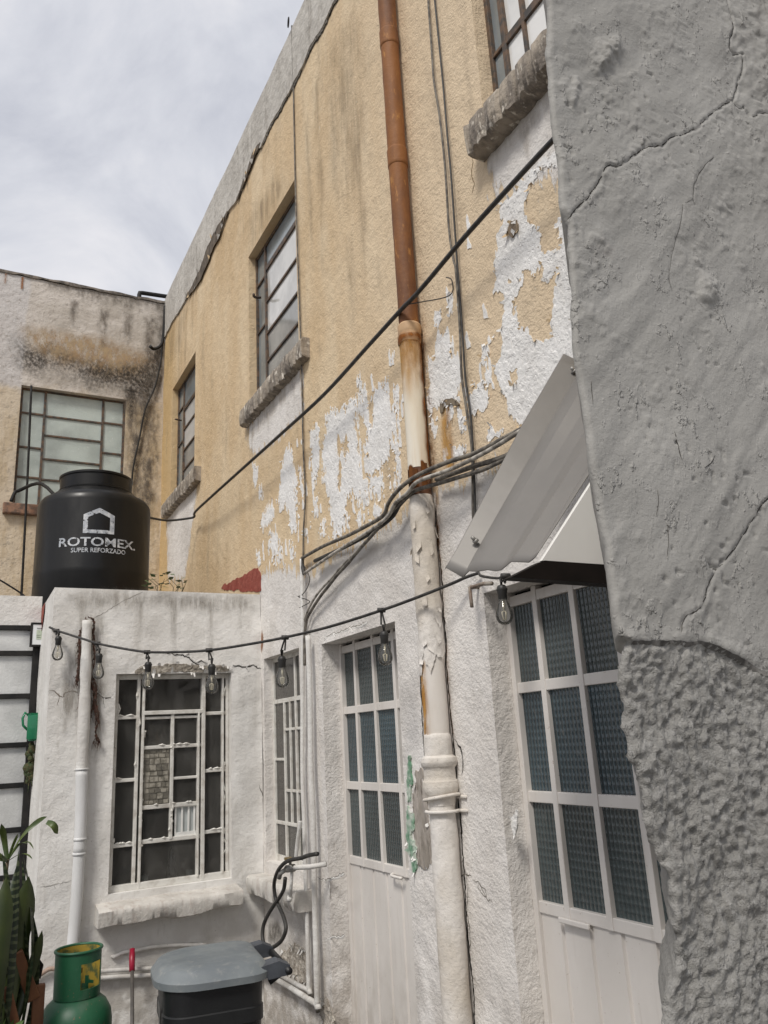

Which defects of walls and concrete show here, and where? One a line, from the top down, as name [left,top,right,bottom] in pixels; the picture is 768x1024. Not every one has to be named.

crack [568,4,768,219]
water stain [23,310,163,500]
peeling [252,349,446,675]
peeling [425,151,573,461]
crack [681,498,768,632]
flaking render [404,755,432,877]